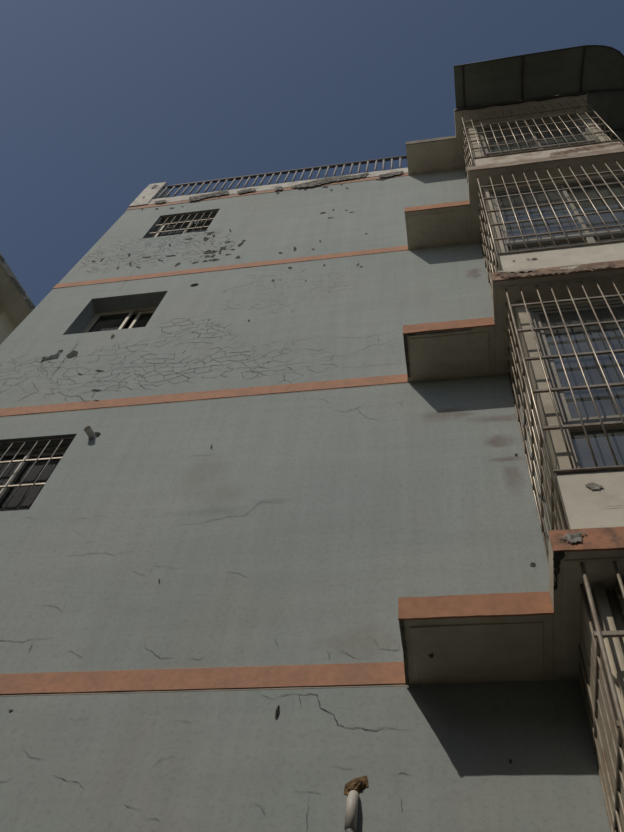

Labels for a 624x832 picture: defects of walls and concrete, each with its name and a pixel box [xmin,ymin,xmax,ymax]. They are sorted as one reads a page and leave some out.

peeling [193,229,246,264]
peeling [41,350,78,362]
crack [0,316,334,403]
crack [261,693,407,731]